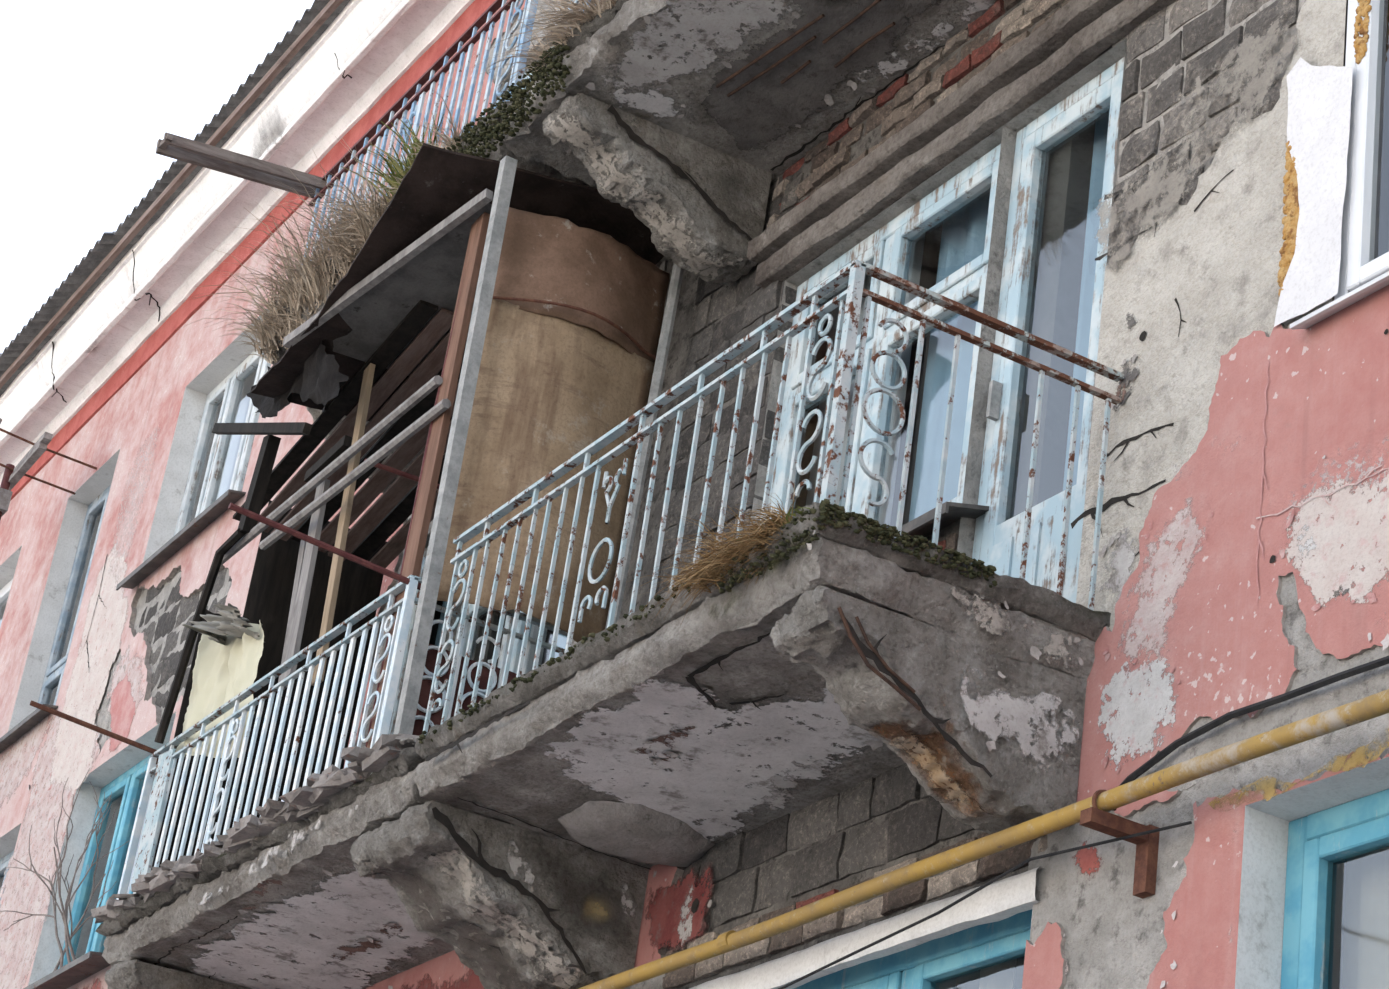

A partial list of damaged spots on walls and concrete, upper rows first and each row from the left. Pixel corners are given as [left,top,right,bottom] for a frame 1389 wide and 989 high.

crack [607,105,752,240]
spalling [586,0,1071,232]
crack [1071,479,1166,537]
crack [1107,423,1174,461]
flaking render [1063,0,1389,780]
crack [685,632,785,710]
crack [837,607,993,778]
peeling [0,544,232,989]
corrosion [871,720,993,817]
peeling [190,866,485,989]
spalling [425,849,596,989]
crack [432,797,651,974]